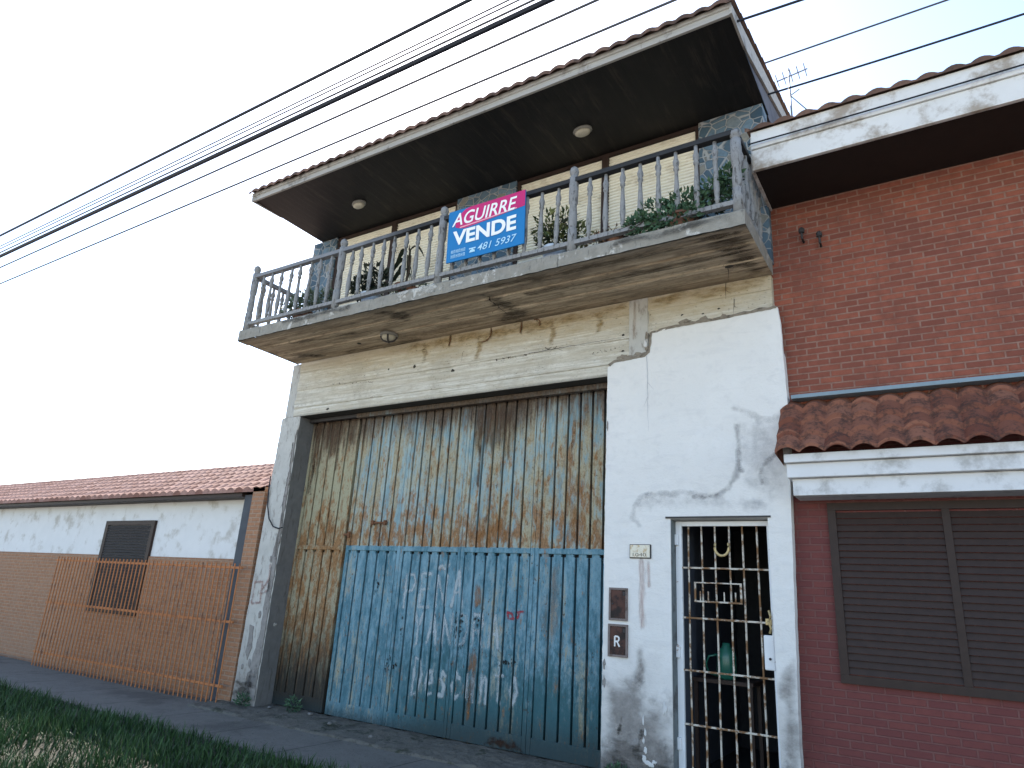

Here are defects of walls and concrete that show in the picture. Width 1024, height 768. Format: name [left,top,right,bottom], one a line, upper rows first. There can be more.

leakage [686,234,760,272]
leakage [438,249,676,356]
flaking render [608,306,776,366]
corrosion [308,420,355,489]
leakage [606,664,667,768]